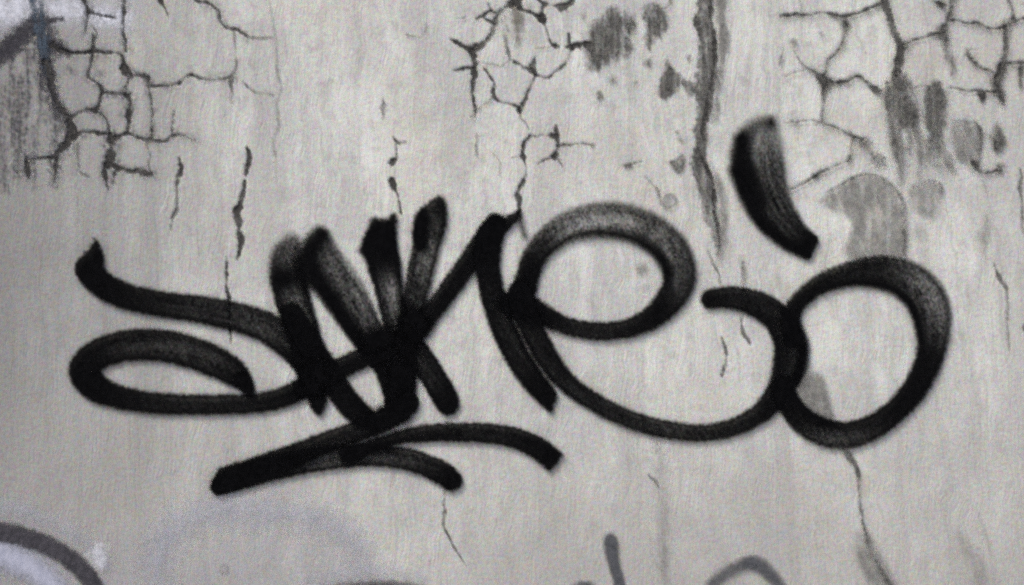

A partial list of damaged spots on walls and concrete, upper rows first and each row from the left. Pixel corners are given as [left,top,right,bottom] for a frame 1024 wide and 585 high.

crack [0,0,273,229]
crack [451,0,594,209]
crack [779,0,1024,185]
crack [225,147,275,300]